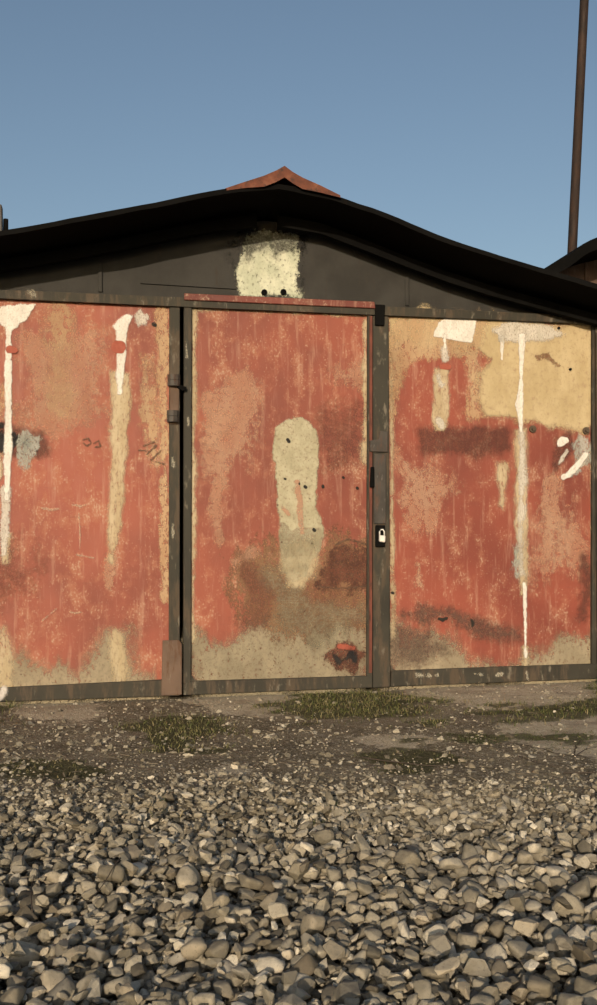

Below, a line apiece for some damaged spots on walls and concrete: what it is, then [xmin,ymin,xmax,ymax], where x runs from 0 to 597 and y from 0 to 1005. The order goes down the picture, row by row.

peeling [182,417,366,681]
rust [315,538,367,596]
peeling [0,628,155,687]
rust [324,641,366,675]
peeling [384,621,597,690]
peeling [0,696,164,705]
peeling [203,688,360,697]